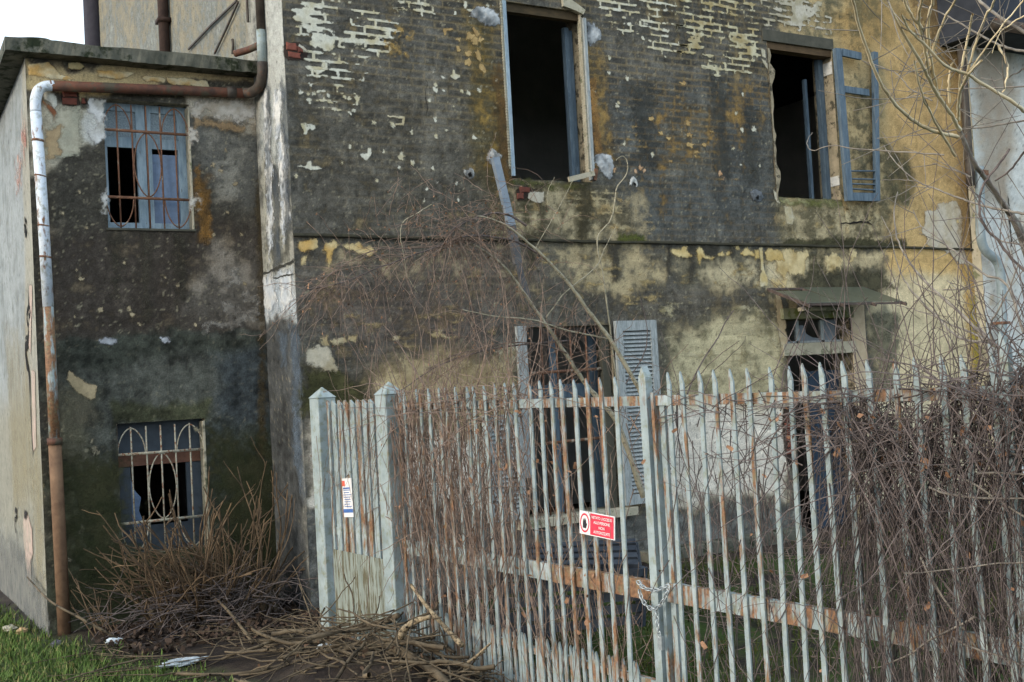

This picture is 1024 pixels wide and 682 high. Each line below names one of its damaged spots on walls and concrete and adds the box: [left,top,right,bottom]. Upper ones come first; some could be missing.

peeling [27,62,106,160]
peeling [97,70,321,260]
damp [257,80,291,270]
peeling [194,239,374,333]
peeling [306,335,357,372]
peeling [283,0,435,115]
damp [528,185,546,271]
damp [579,185,592,240]
damp [608,243,621,282]
peeling [597,0,832,225]
peeling [734,248,809,359]
damp [666,104,910,287]